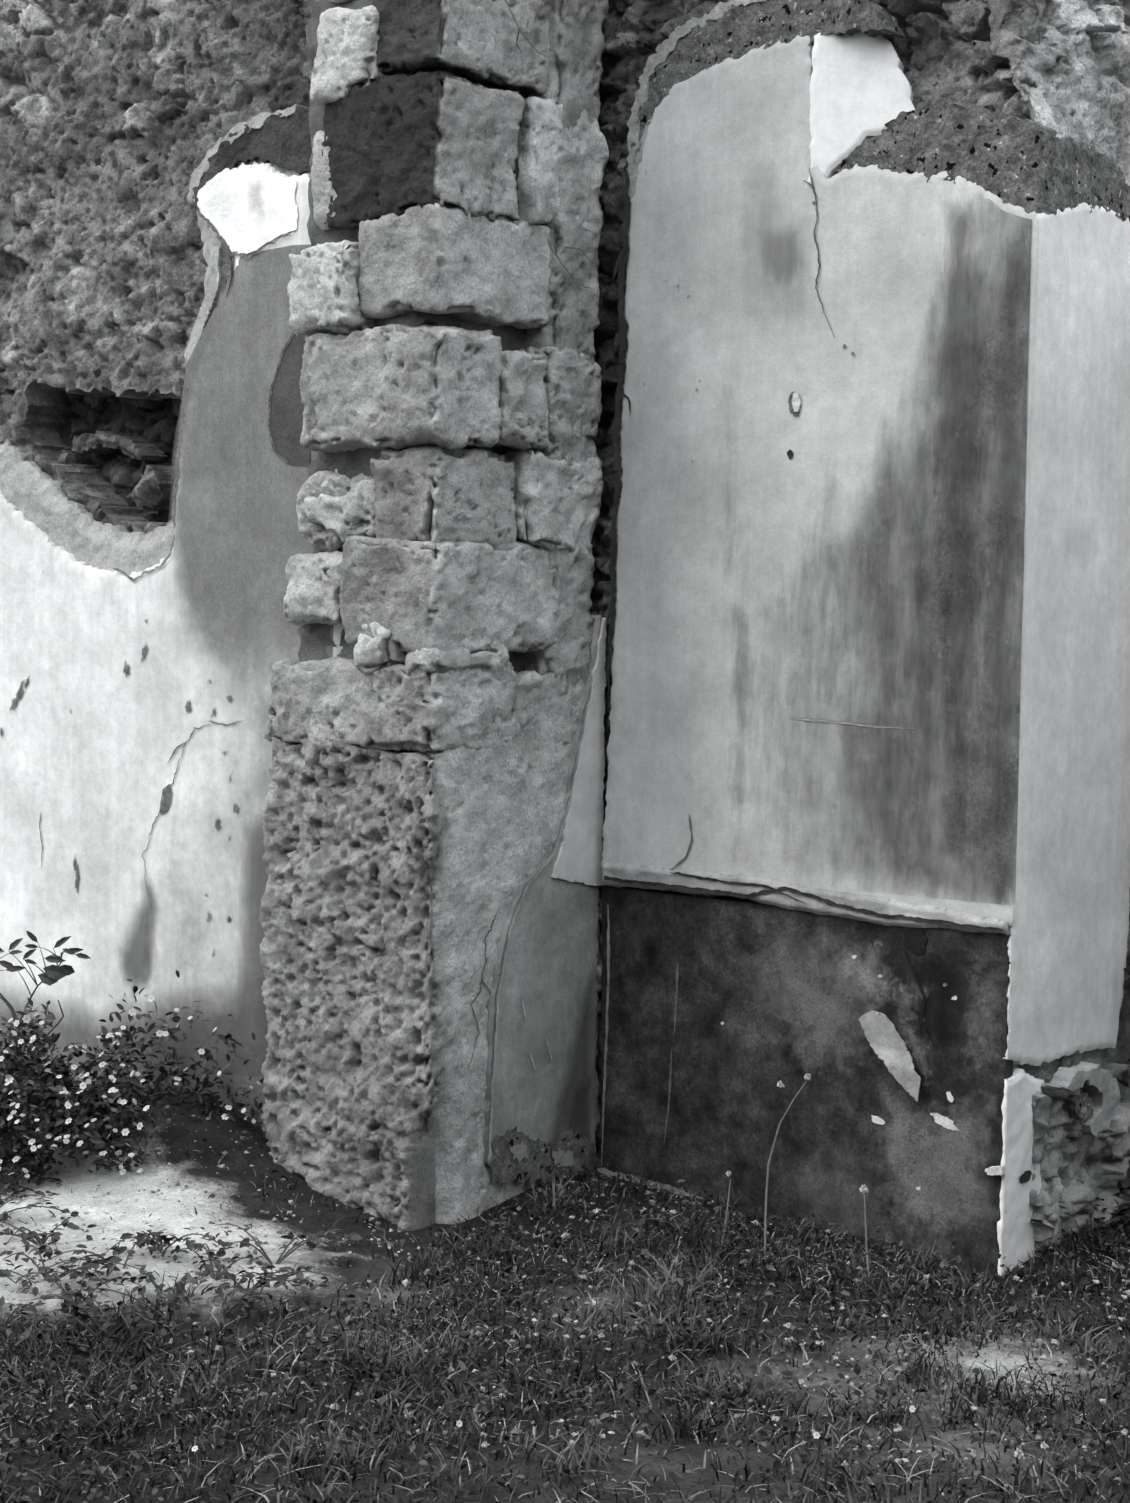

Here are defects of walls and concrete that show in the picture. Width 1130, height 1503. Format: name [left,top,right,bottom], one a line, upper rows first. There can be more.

spalling [835,103,1130,221]
peeling [184,104,312,364]
crack [803,168,855,356]
spalling [267,330,311,467]
peeling [56,430,178,529]
leakage [844,218,1032,900]
spalling [10,676,29,710]
crack [142,721,241,896]
crack [604,815,1003,933]
spalling [491,1126,598,1188]
flaking render [1048,1061,1121,1137]